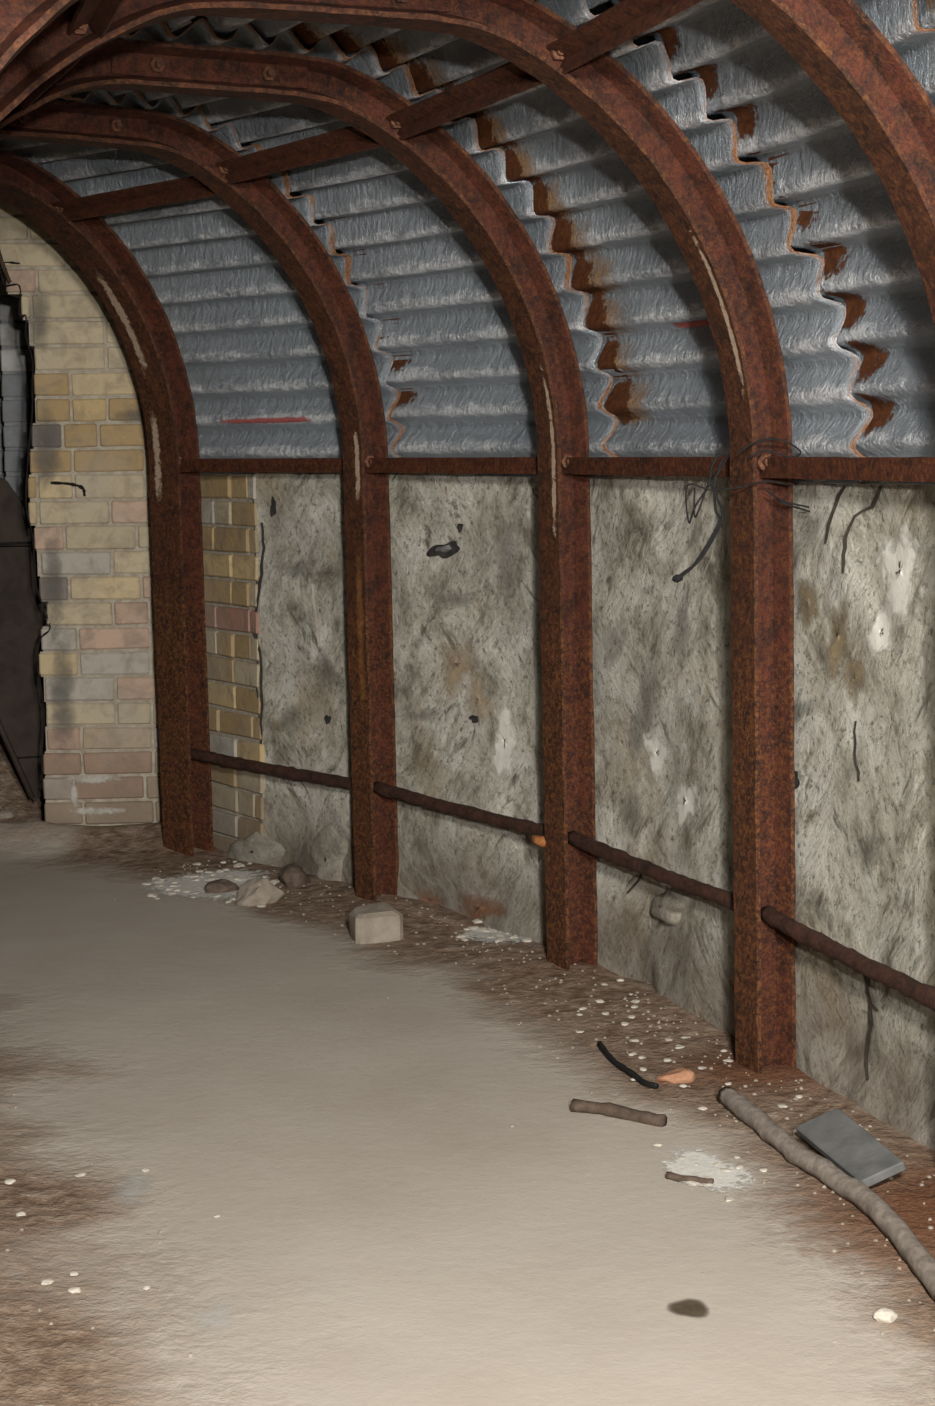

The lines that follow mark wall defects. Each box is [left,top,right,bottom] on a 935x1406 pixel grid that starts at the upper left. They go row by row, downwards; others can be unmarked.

rust [291,22,455,92]
rust [380,318,418,407]
rust [456,110,643,427]
rust [637,27,896,437]